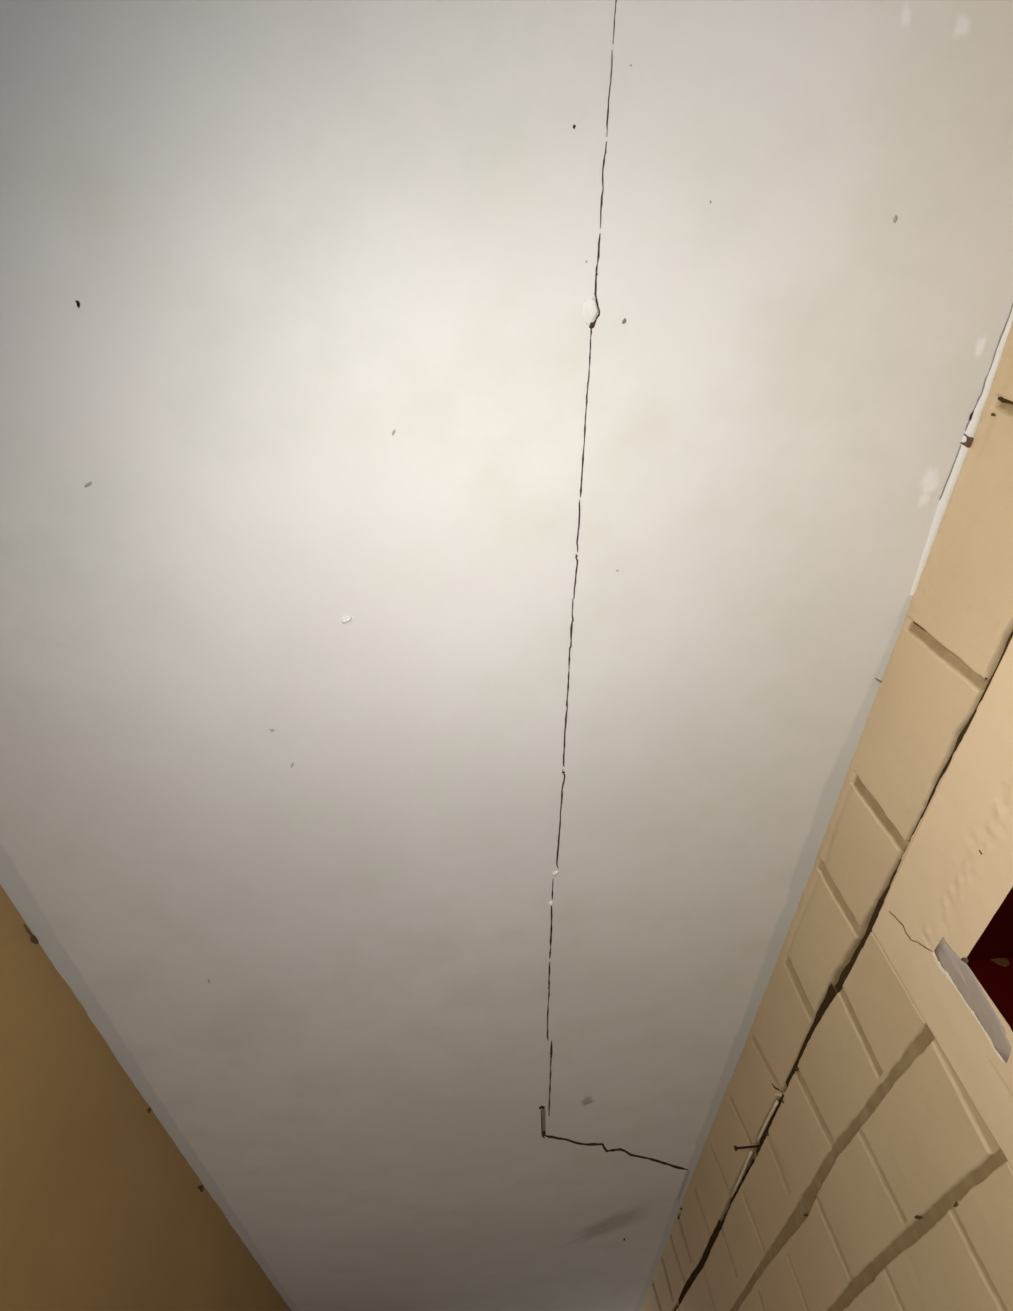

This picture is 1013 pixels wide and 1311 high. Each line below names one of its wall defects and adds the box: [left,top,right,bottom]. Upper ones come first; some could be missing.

crack [539,0,690,1201]
crack [939,303,1013,500]
crack [674,630,1013,1311]